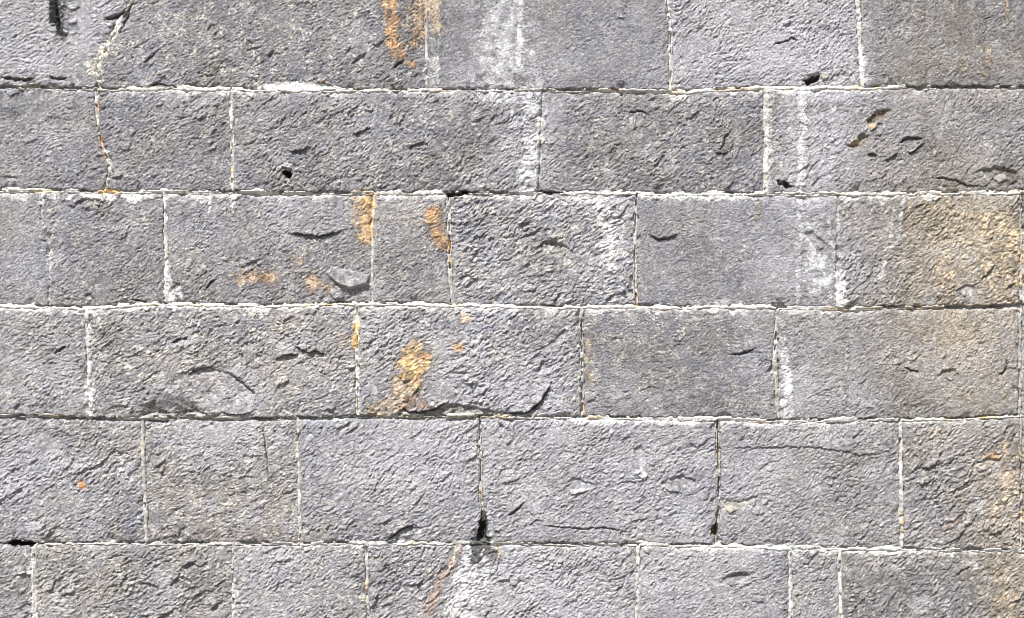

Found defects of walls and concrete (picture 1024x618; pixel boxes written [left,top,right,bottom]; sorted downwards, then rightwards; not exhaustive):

corrosion [377,0,448,68]
corrosion [350,186,380,247]
corrosion [423,203,453,254]
spalling [144,368,255,419]
corrosion [365,336,436,421]